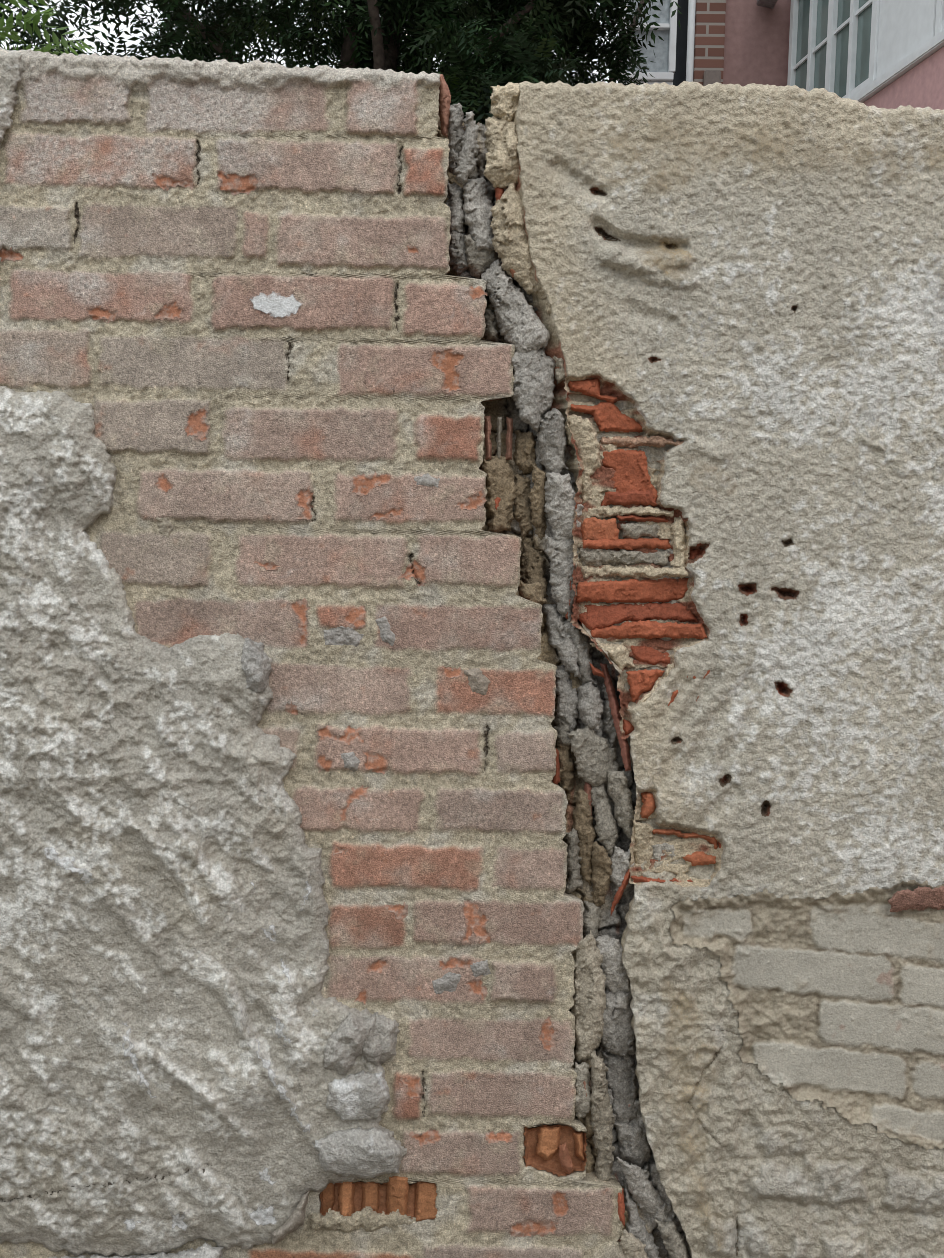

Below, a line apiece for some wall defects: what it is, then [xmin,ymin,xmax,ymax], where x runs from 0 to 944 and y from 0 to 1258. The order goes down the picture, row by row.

spalling [216,170,258,195]
crack [395,148,403,194]
spalling [429,348,465,394]
spalling [564,375,710,739]
crack [436,74,692,1258]
spalling [316,725,388,775]
spalling [439,900,491,1000]
peeling [629,789,944,1150]
crack [688,1028,737,1144]
spalling [485,1125,587,1176]
spalling [320,1176,438,1222]
spalling [510,1191,569,1237]